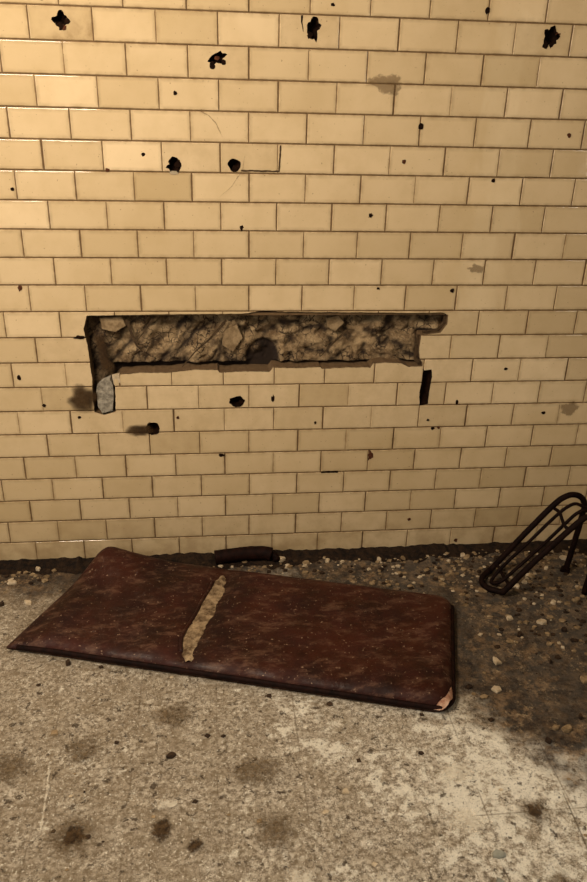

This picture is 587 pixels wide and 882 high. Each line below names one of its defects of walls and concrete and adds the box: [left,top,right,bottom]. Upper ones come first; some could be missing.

spalling [74,311,447,413]